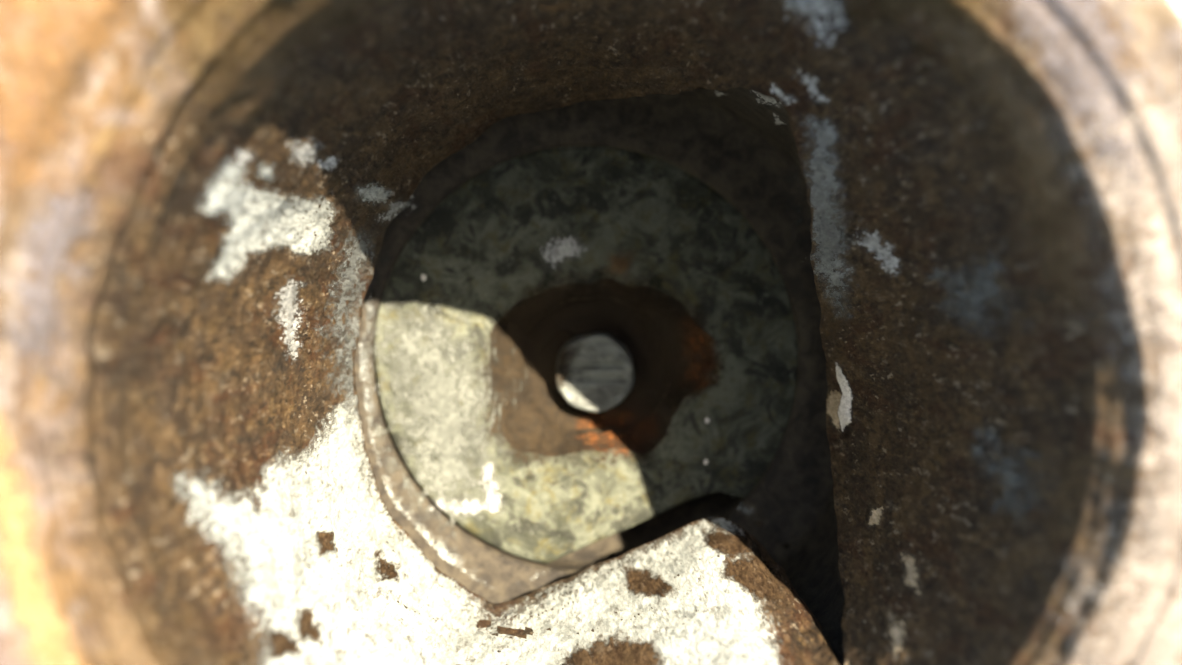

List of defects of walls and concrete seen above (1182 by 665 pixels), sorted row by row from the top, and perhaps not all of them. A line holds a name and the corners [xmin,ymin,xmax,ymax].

damp [199,0,368,128]
rust [483,271,714,465]
rust [317,531,338,555]
rust [374,550,399,582]
rust [623,565,674,597]
rust [702,521,793,607]
rust [263,608,323,659]
rust [562,631,663,665]